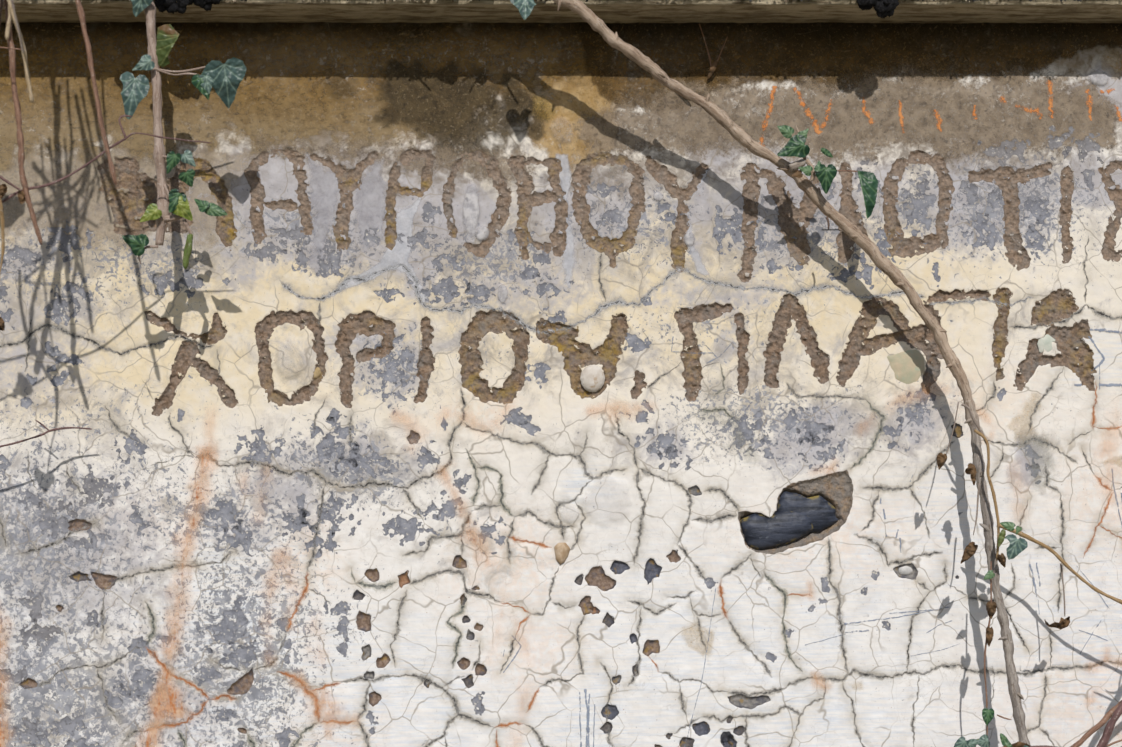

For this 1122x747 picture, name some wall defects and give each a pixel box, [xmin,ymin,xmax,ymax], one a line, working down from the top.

damp [0,22,1122,275]
damp [561,217,575,286]
crack [282,238,1122,334]
crack [0,321,220,380]
crack [648,362,732,417]
crack [39,371,1122,747]
spalling [574,560,630,627]
spalling [644,550,681,584]
rust [146,672,183,747]
peeling [323,590,390,734]
peeling [457,657,487,716]
spalling [655,694,771,747]